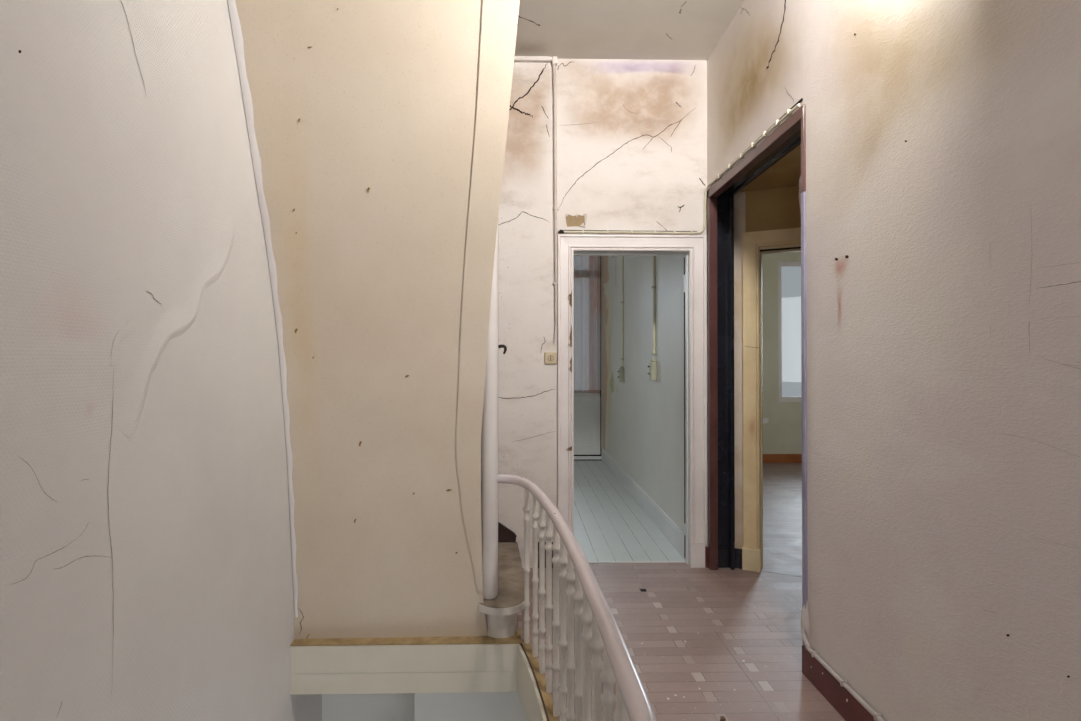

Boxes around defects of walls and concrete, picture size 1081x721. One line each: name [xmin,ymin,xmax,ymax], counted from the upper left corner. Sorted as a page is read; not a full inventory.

crack [766,0,786,69]
crack [509,62,597,137]
crack [499,102,694,225]
peeling [565,213,587,227]
crack [10,372,114,667]